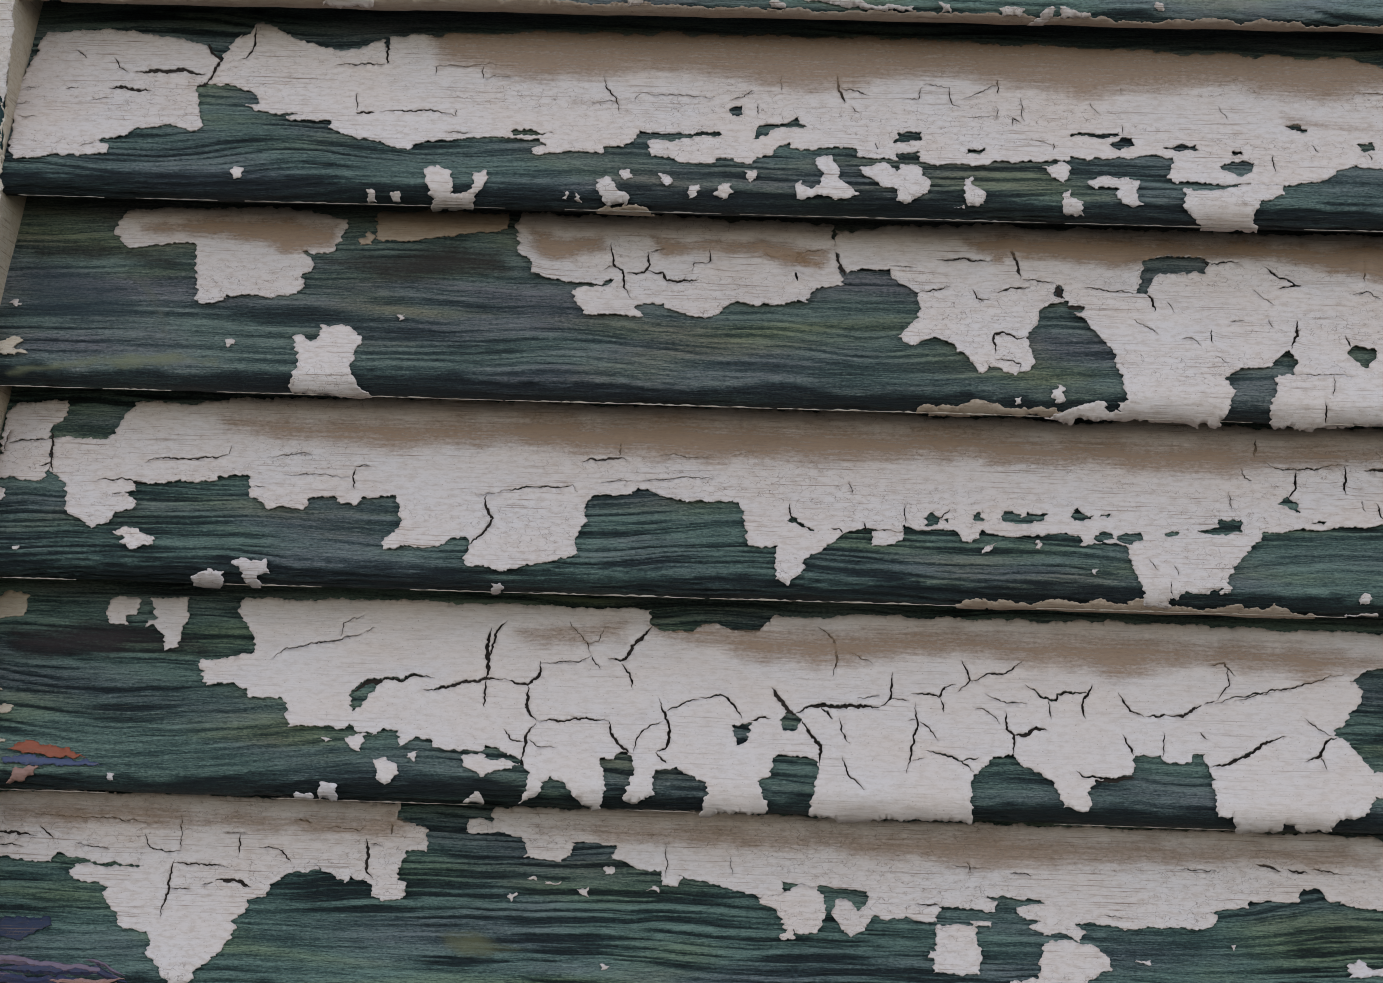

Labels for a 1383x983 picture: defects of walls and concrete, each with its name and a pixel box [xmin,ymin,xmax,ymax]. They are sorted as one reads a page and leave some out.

peeling [0,0,1383,619]
crack [103,456,217,494]
crack [587,444,698,482]
crack [1330,465,1383,491]
crack [466,486,559,550]
peeling [106,595,190,651]
peeling [0,688,14,713]
crack [355,622,1331,789]
peeling [198,597,1383,983]
peeling [0,738,440,983]